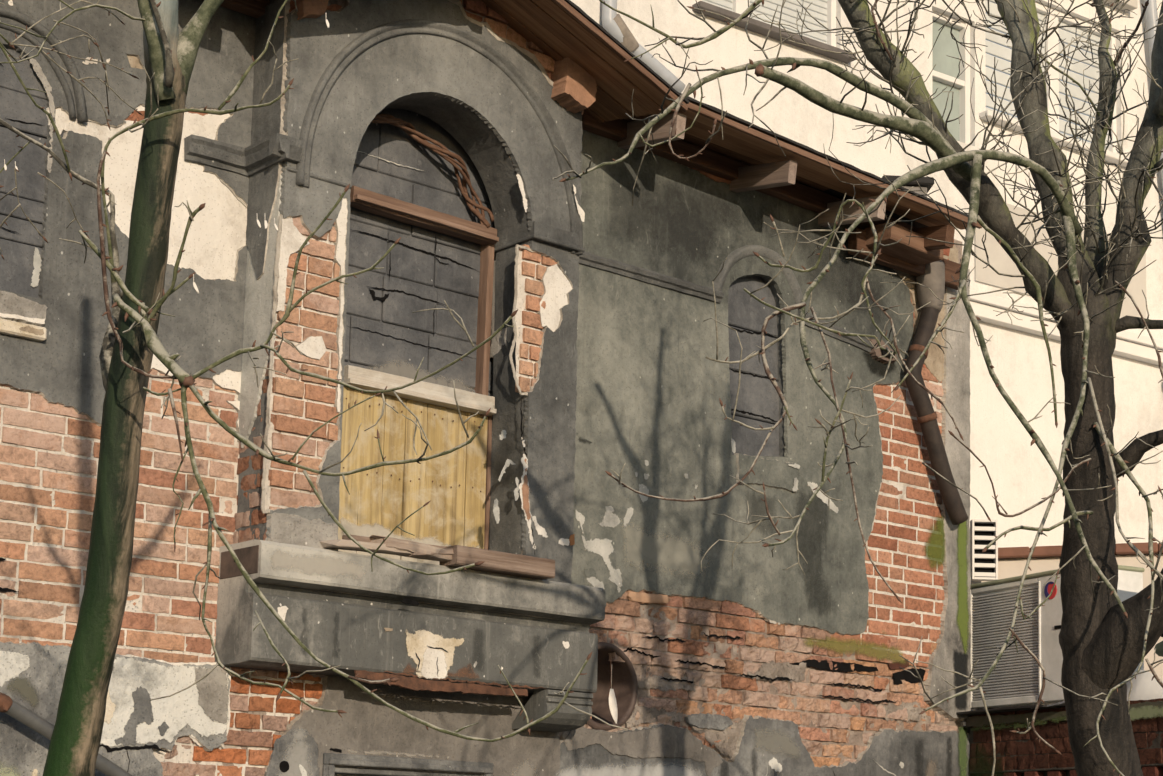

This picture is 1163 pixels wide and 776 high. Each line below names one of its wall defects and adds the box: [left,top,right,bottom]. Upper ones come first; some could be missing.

spalling [30,58,145,238]
spalling [490,244,572,396]
spalling [866,339,898,364]
spalling [921,294,945,433]
spalling [943,241,962,264]
crack [0,557,19,592]
spalling [0,385,101,688]
spalling [101,108,348,776]
peeling [498,459,519,501]
spalling [532,380,958,767]
spalling [384,628,464,679]
peeling [769,757,782,773]